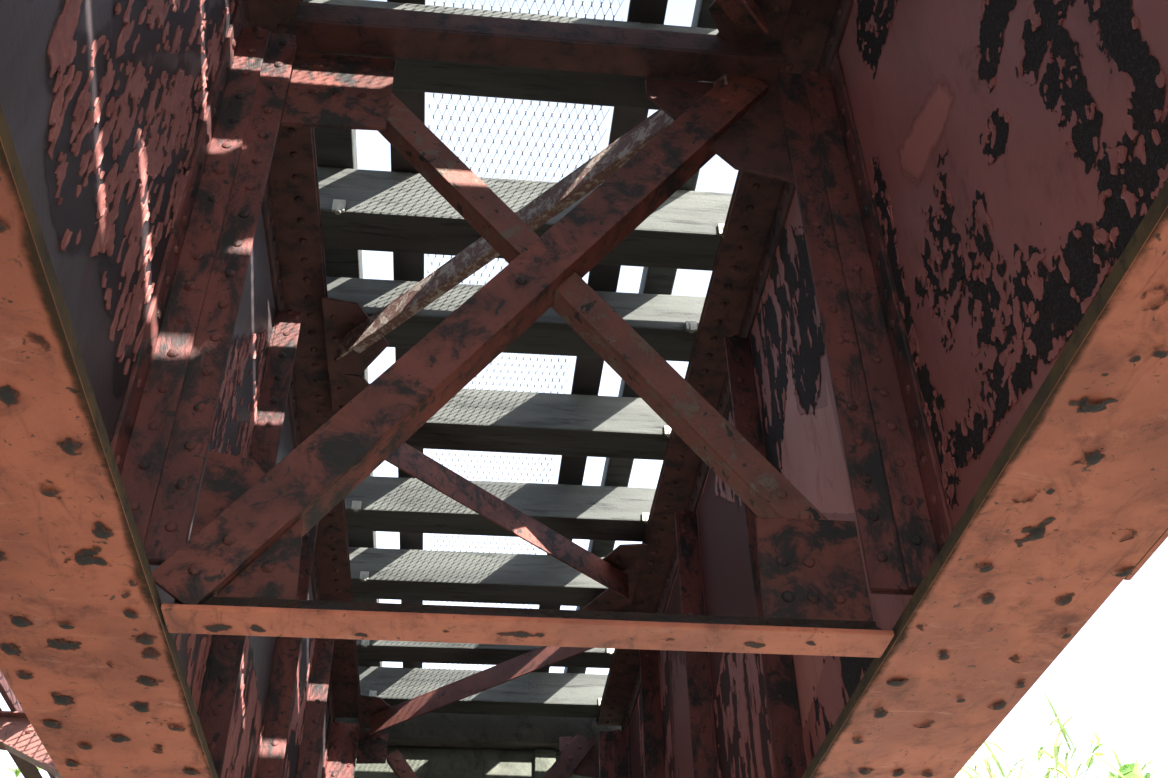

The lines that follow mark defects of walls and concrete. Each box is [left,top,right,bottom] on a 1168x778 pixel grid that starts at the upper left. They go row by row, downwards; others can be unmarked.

peeling [46,0,235,397]
peeling [870,0,1168,508]
corrosion [0,385,19,407]
peeling [750,225,825,473]
corrosion [1069,397,1118,413]
corrosion [63,522,113,566]
corrosion [1015,517,1058,547]
corrosion [51,692,75,706]
corrosion [47,624,82,650]
peeling [221,636,264,778]
peeling [282,638,315,778]
peeling [713,652,775,778]